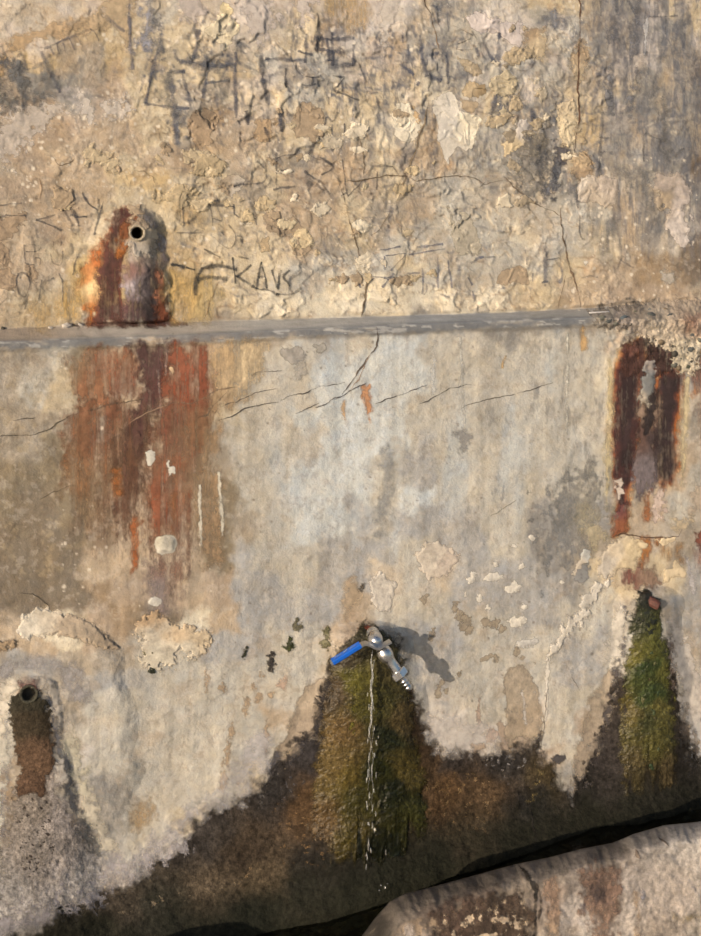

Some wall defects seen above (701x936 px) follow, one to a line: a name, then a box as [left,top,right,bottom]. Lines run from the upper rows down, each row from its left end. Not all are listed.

peeling [432,11,619,208]
crack [574,0,593,165]
rust [28,207,224,330]
rust [60,340,270,616]
crack [1,332,379,436]
crack [360,282,368,316]
crack [376,383,551,406]
spalling [587,297,701,377]
rust [605,335,701,539]
peeling [0,606,120,651]
peeling [132,596,213,672]
damp [0,576,701,936]